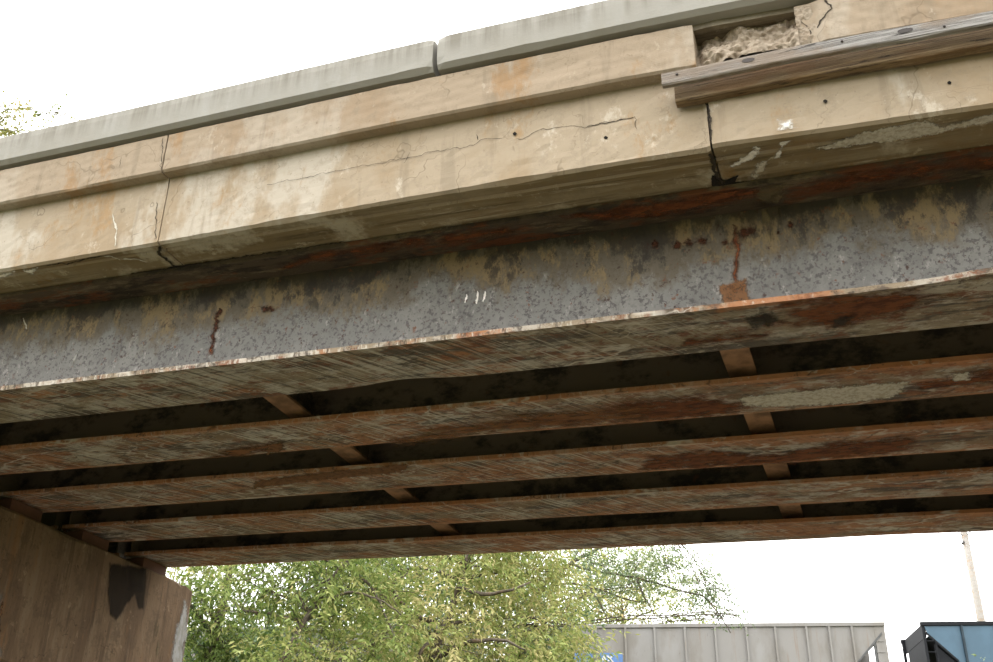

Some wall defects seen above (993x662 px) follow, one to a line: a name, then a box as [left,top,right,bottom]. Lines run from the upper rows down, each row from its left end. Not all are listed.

spalling [697,4,817,67]
crack [705,103,747,187]
rust [719,224,756,303]
rust [209,308,223,354]
leakage [108,564,147,619]